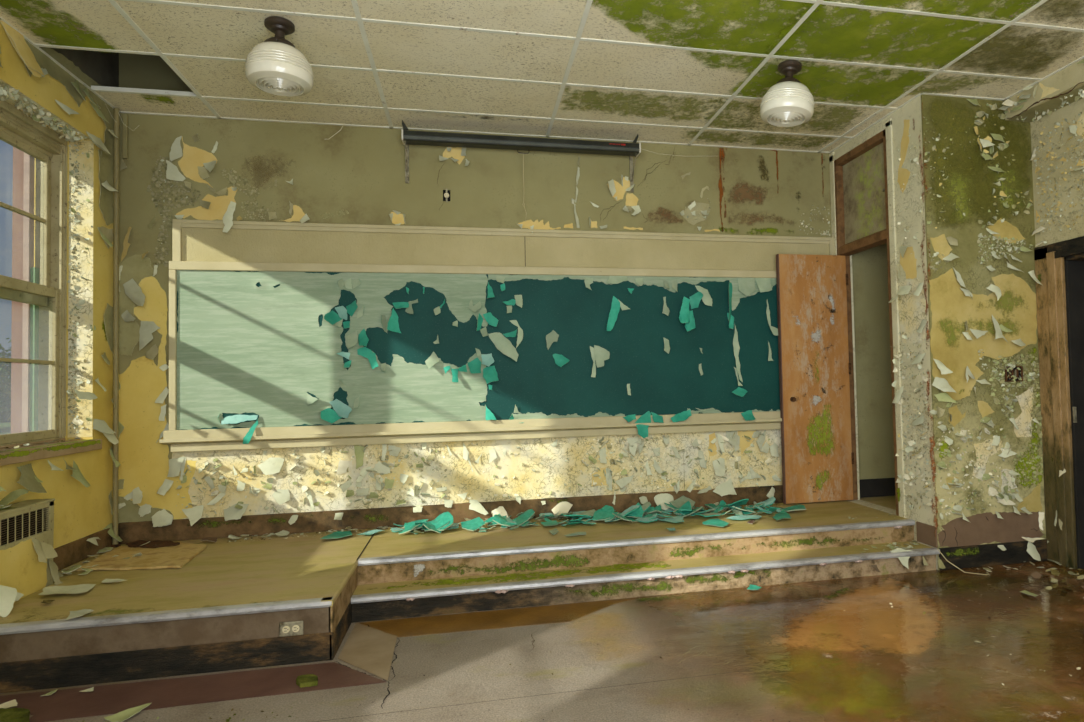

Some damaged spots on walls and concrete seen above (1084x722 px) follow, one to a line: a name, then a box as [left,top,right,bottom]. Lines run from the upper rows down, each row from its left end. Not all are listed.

peeling [883,82,1084,569]
peeling [104,703,151,722]